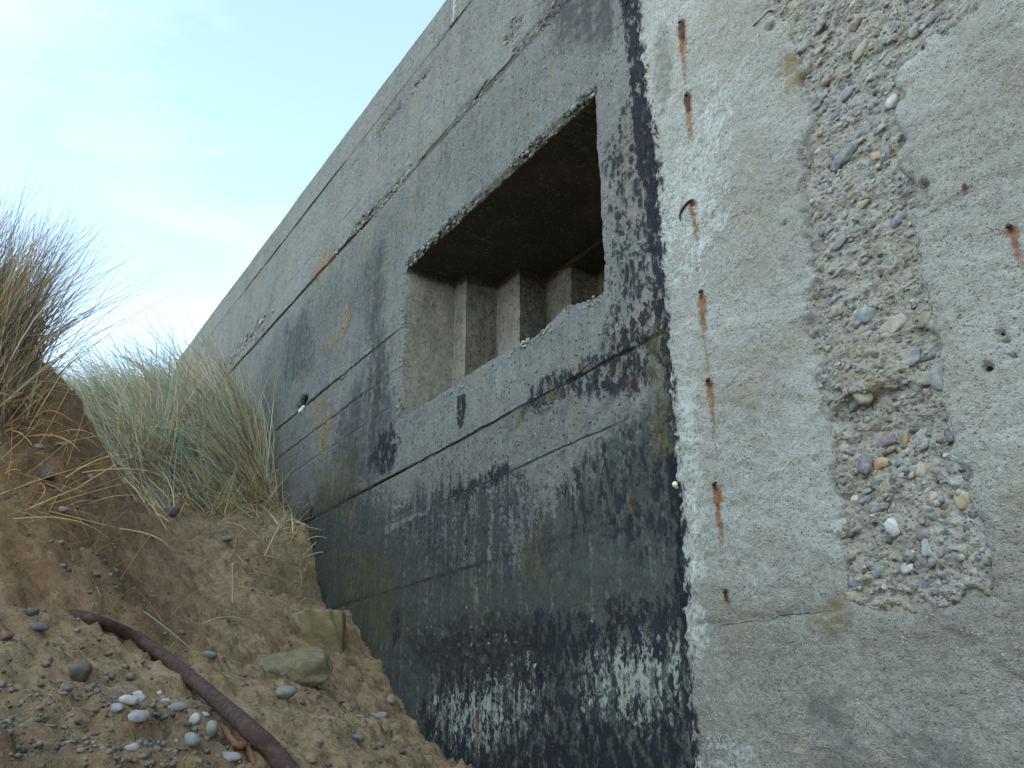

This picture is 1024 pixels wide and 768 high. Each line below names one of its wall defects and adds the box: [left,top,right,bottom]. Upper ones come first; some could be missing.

rust [677,19,687,75]
rust [683,91,692,137]
rust [679,199,698,245]
rust [1004,223,1024,269]
rust [697,289,706,331]
spalling [772,0,995,615]
rust [705,367,715,435]
damp [285,249,695,768]
rust [711,481,723,543]